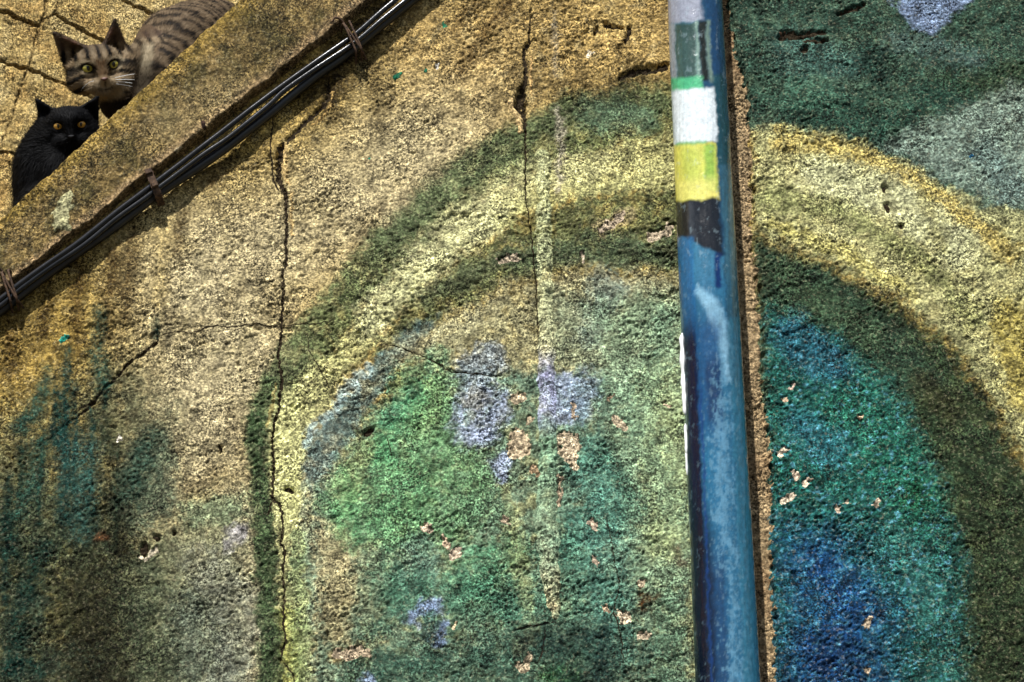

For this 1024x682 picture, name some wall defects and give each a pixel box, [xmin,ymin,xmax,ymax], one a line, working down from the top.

crack [507,14,539,340]
crack [39,81,335,681]
spalling [506,416,540,478]